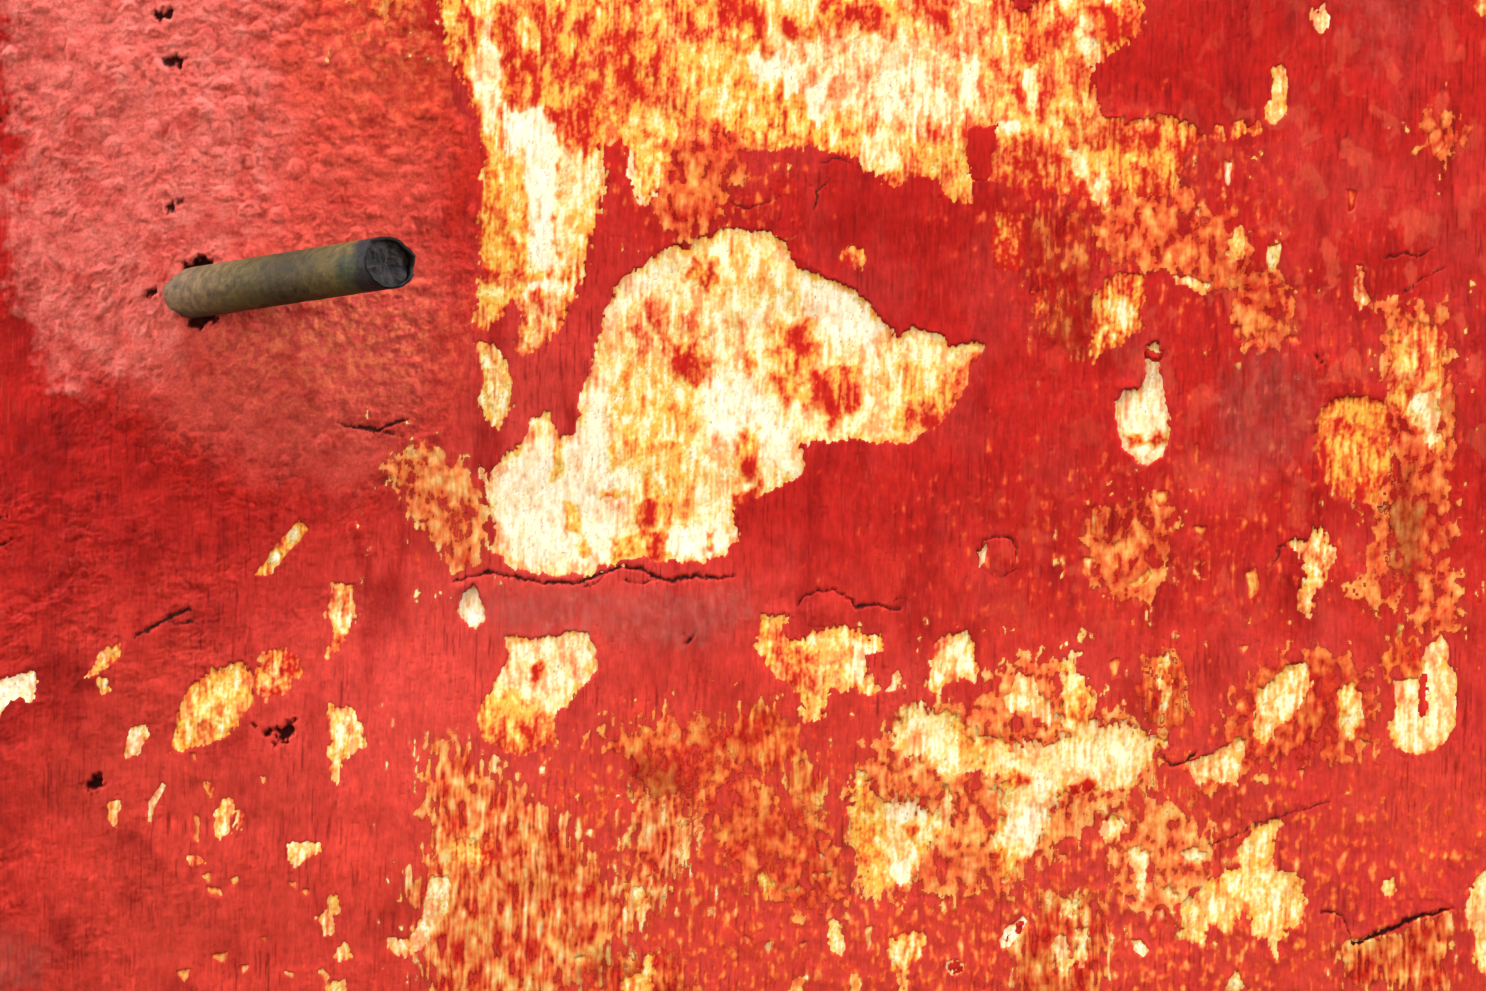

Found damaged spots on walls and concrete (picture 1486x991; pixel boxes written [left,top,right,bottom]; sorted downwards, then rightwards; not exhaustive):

peeling [345,0,1298,585]
crack [452,565,735,588]
peeling [387,265,1486,991]
peeling [0,670,39,715]
peeling [169,647,303,760]
peeling [212,952,248,974]